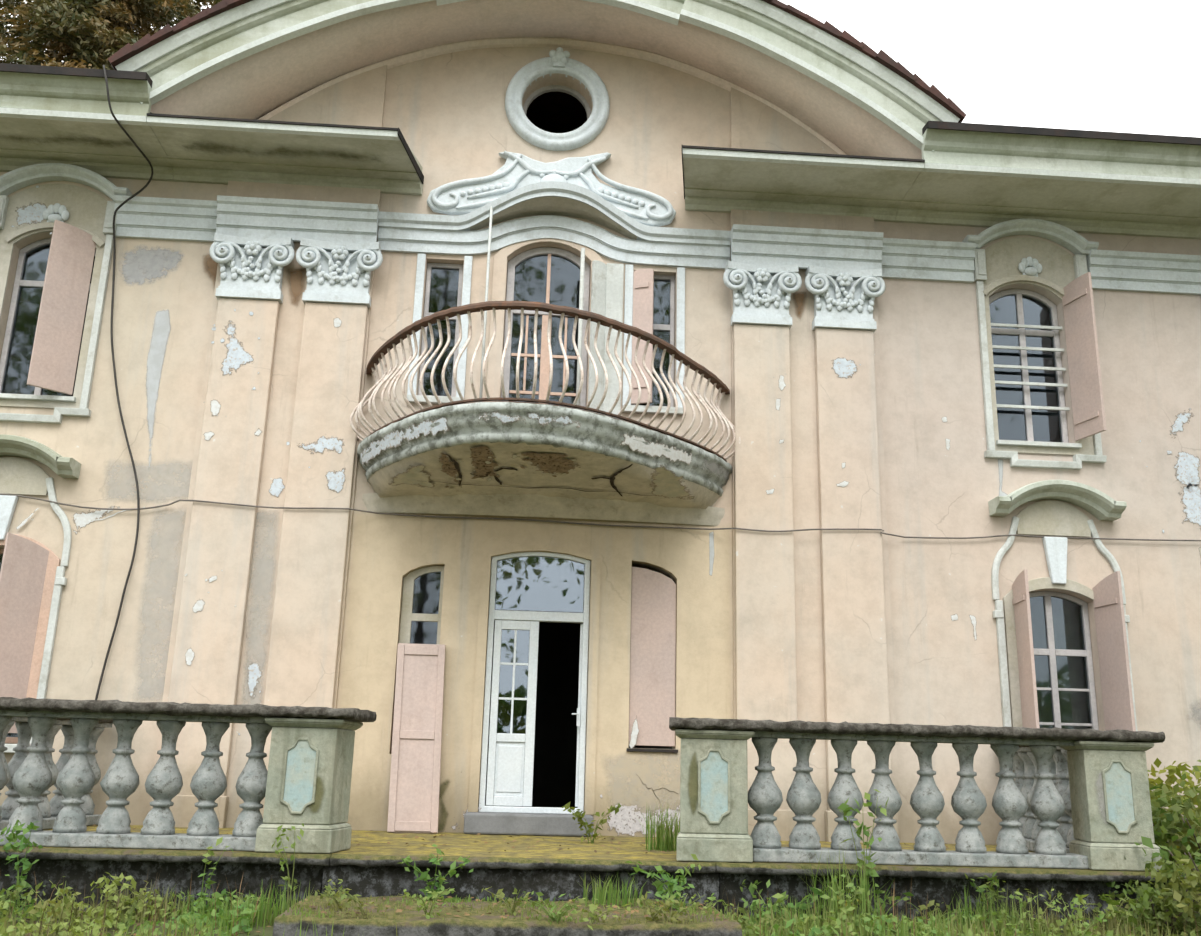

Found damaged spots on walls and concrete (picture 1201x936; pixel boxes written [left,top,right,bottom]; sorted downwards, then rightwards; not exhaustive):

peeling [211,309,259,390]
peeling [831,357,861,379]
peeling [286,436,344,468]
peeling [325,469,345,493]
peeling [360,417,449,465]
spalling [439,446,500,490]
crack [425,454,656,496]
spalling [512,452,580,477]
peeling [620,433,692,465]
peeling [1167,408,1201,529]
peeling [593,803,680,837]